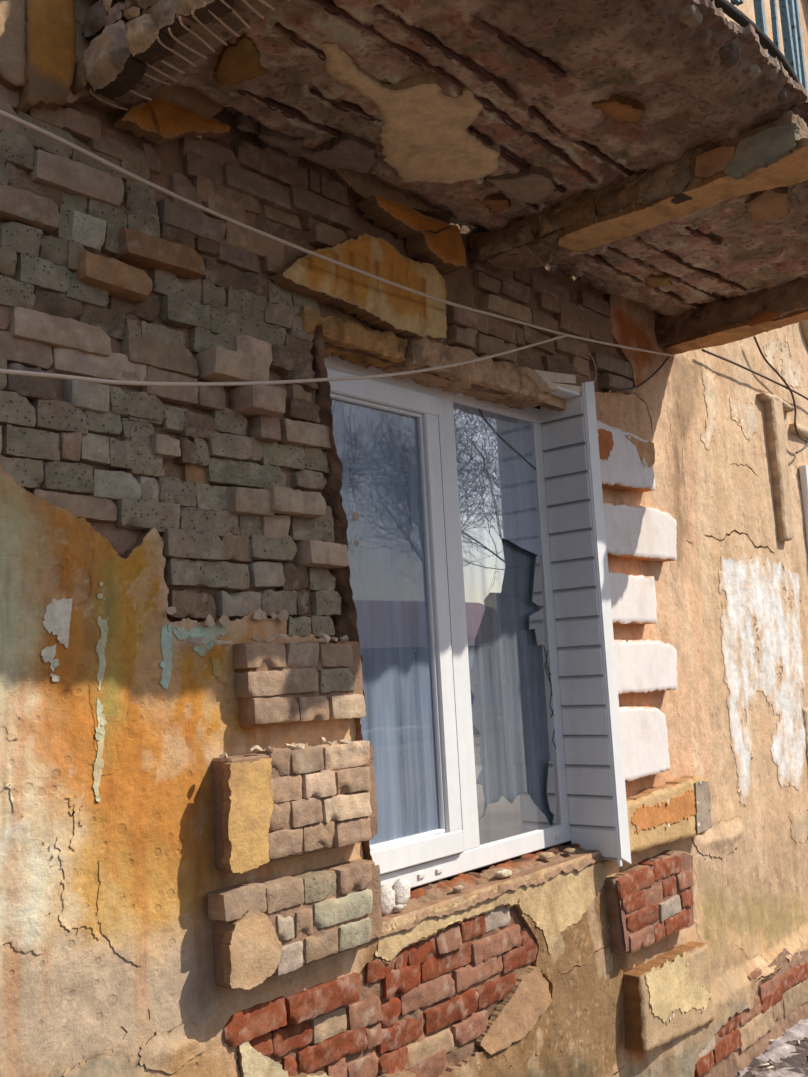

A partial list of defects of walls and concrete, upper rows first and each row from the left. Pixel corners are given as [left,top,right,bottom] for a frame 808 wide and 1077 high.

spalling [313,0,595,181]
spalling [574,141,633,176]
spalling [678,3,808,126]
flaking render [0,0,454,725]
flaking render [425,214,637,395]
peeling [598,429,655,467]
spalling [584,237,747,309]
water stain [0,471,69,741]
water stain [85,544,130,775]
crack [686,529,775,554]
flaking render [208,853,694,1077]
flaking render [694,948,808,1077]